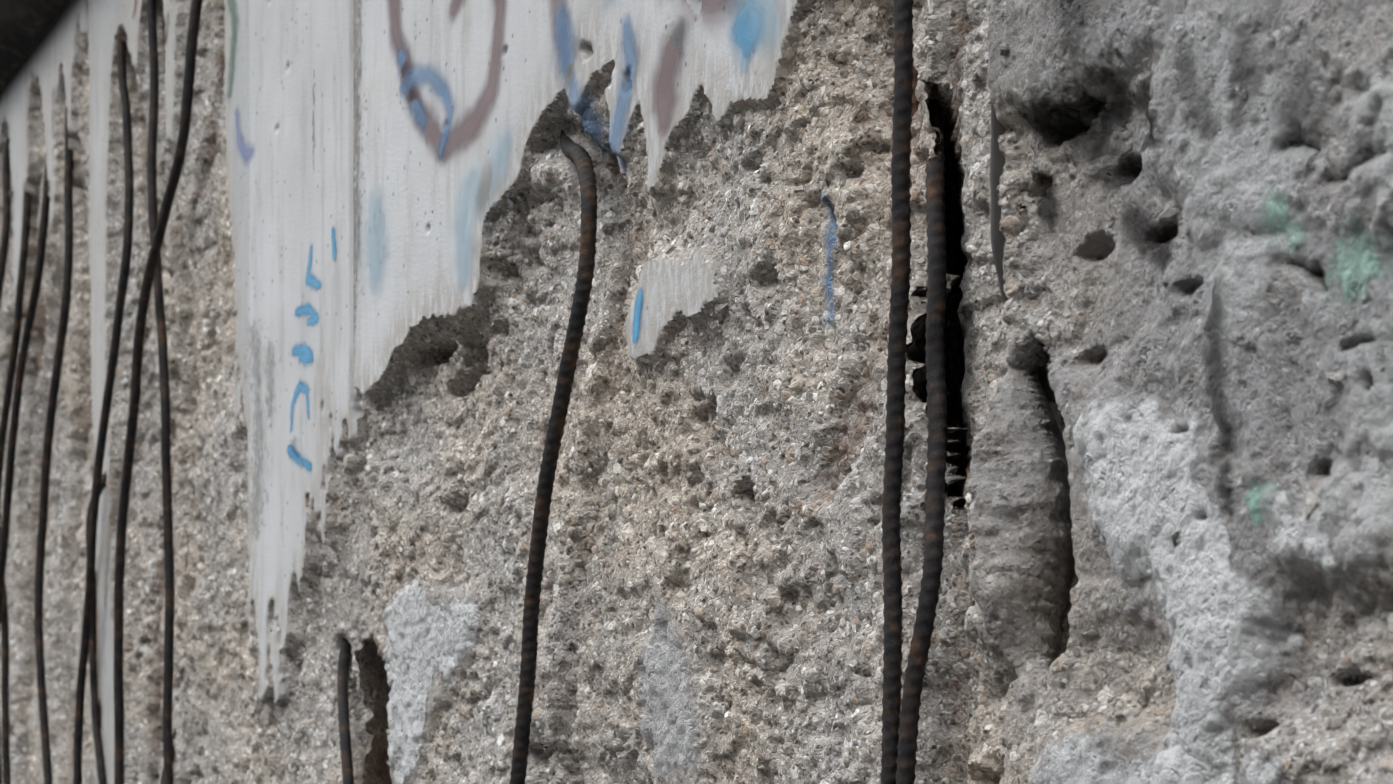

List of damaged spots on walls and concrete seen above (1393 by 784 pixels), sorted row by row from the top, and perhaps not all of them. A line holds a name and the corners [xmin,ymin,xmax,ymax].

spalling [0,0,928,784]
spalling [895,0,1393,784]